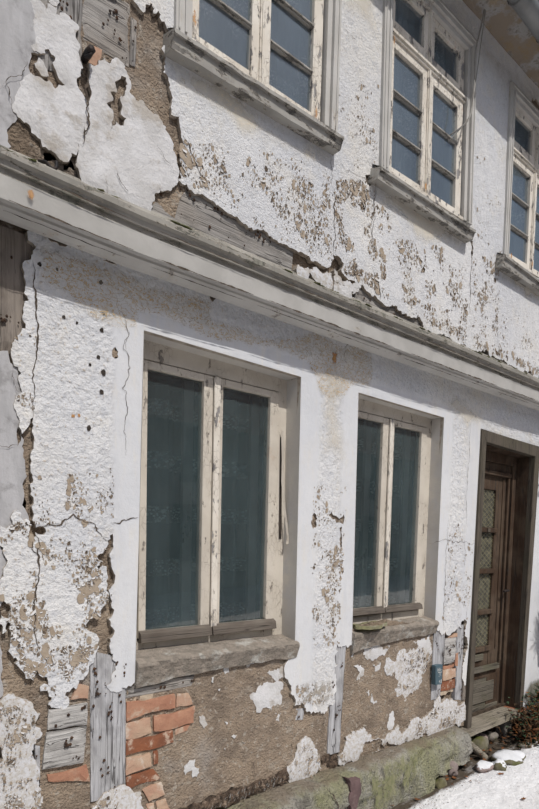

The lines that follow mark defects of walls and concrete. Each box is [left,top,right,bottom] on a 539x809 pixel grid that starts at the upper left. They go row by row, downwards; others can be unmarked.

spalling [0,0,539,375]
crack [32,514,137,653]
spalling [0,393,466,809]
peeling [442,523,473,621]